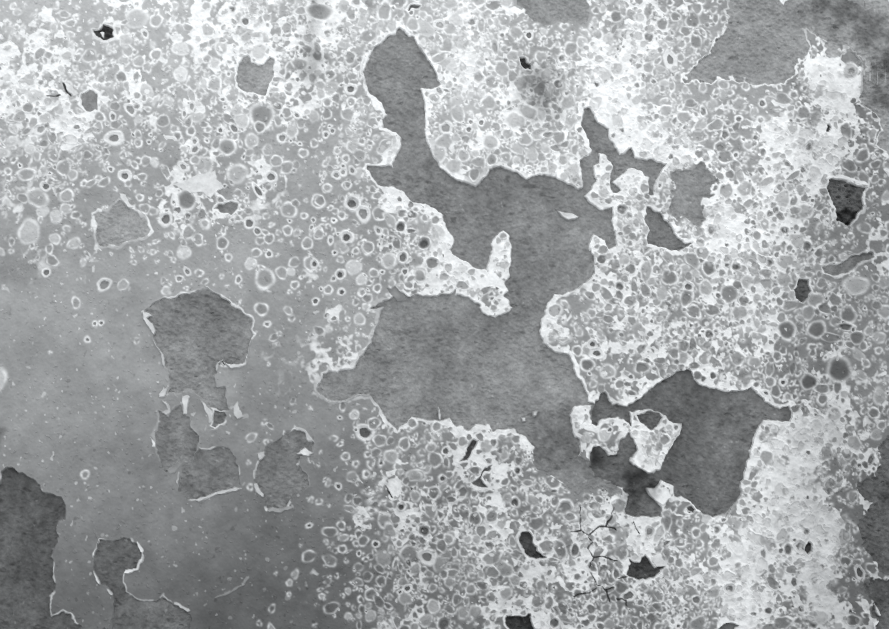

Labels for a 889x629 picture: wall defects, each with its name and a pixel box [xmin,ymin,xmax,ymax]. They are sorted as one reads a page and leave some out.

peeling [517,0,590,26]
peeling [236,55,276,96]
peeling [683,0,889,156]
spalling [826,175,869,227]
peeling [317,28,793,518]
peeling [143,286,254,502]
peeling [254,427,314,513]
peeling [0,468,81,629]
peeling [92,538,192,629]
spalling [505,614,534,629]